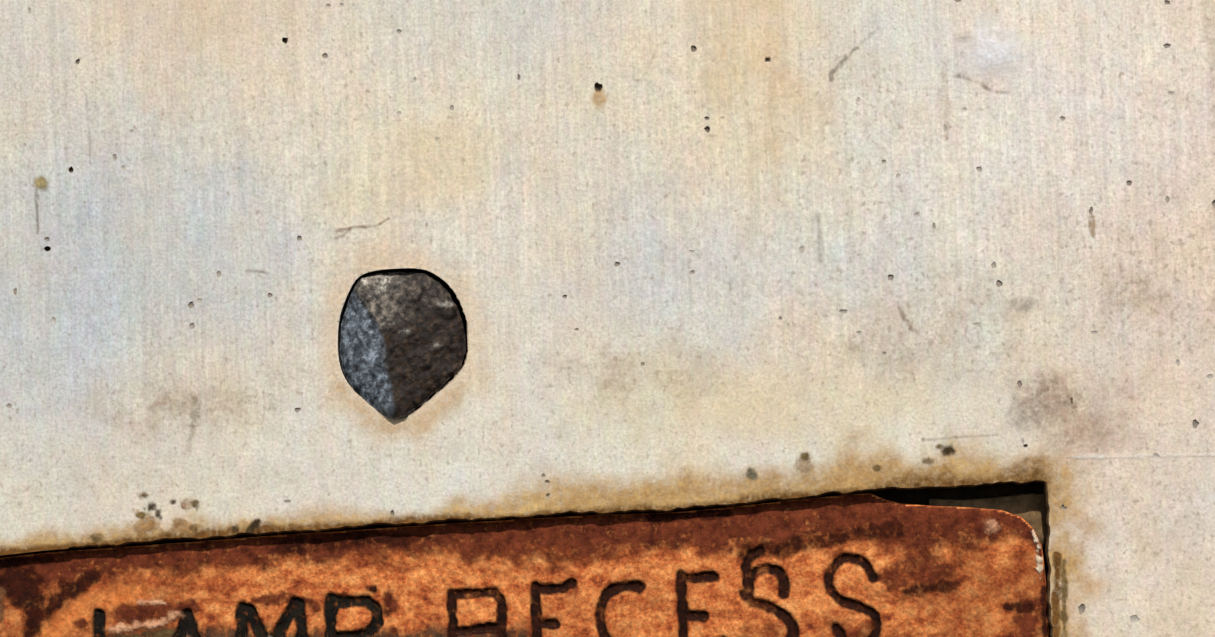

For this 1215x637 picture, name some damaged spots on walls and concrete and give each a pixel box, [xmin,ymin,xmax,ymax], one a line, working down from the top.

rust [0,444,1080,637]